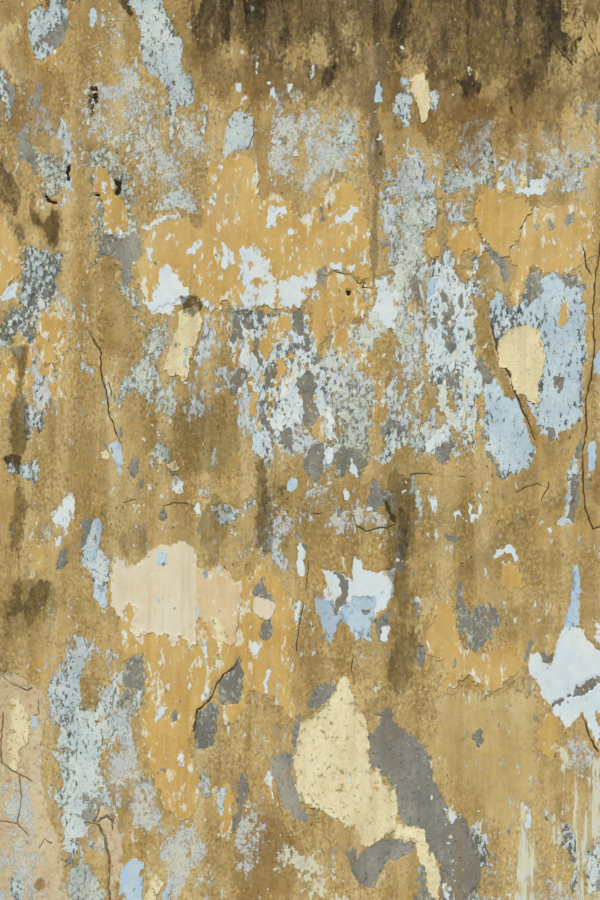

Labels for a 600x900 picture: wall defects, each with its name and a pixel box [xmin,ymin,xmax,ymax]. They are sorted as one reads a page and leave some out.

peeling [27,0,71,62]
peeling [127,0,195,148]
leakage [183,0,600,179]
peeling [0,68,600,533]
crack [86,327,122,444]
crack [582,243,600,530]
peeling [35,491,112,608]
peeling [237,516,307,577]
peeling [294,533,409,644]
peeling [524,565,600,742]
peeling [0,633,147,900]
peeling [265,683,337,823]